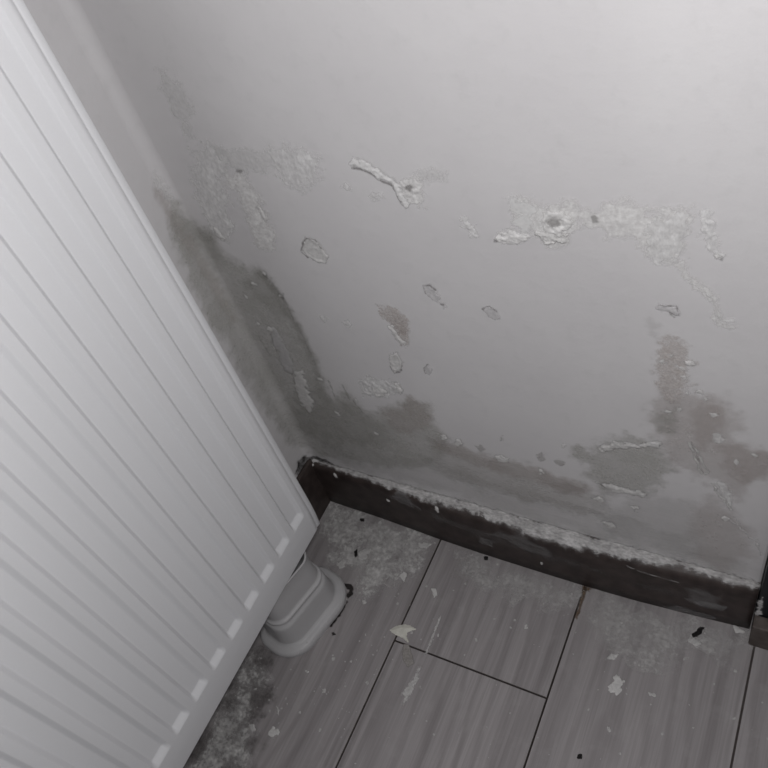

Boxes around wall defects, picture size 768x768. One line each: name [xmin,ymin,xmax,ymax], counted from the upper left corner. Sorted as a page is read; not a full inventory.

peeling [349,157,438,209]